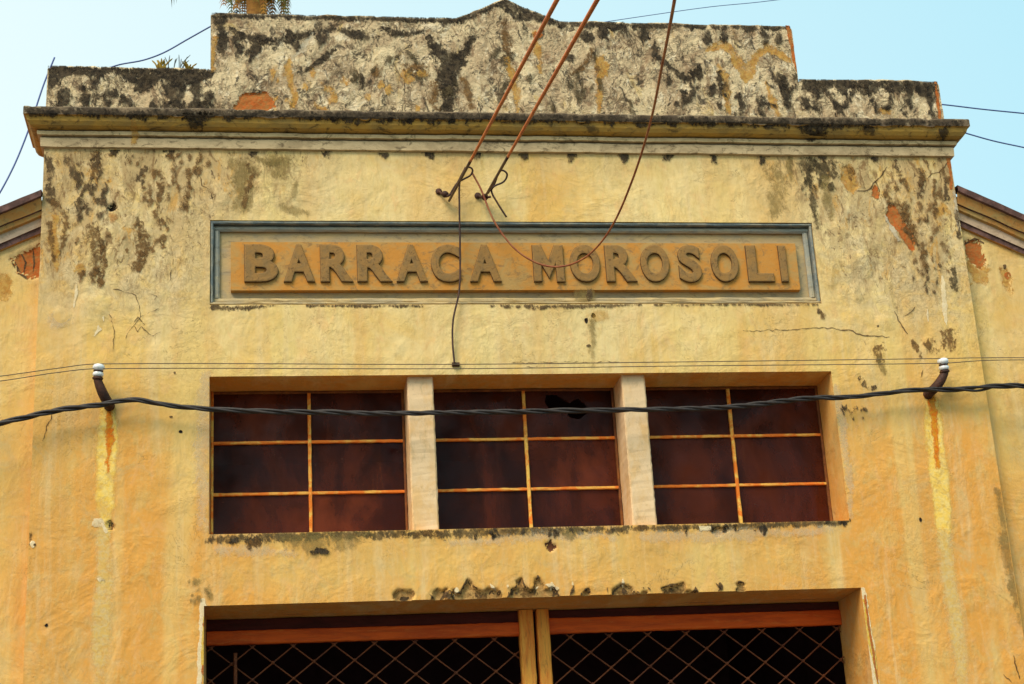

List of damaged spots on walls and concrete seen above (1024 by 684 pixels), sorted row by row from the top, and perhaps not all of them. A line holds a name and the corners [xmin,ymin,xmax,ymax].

water stain [26,0,964,144]
spalling [0,243,40,301]
water stain [44,150,211,272]
crack [109,259,174,351]
crack [728,307,915,345]
water stain [882,157,958,293]
spalling [952,190,1013,291]
rust [91,400,118,684]
spalling [430,575,591,600]
water stain [205,519,851,555]
spalling [607,579,698,595]
rust [924,395,967,684]